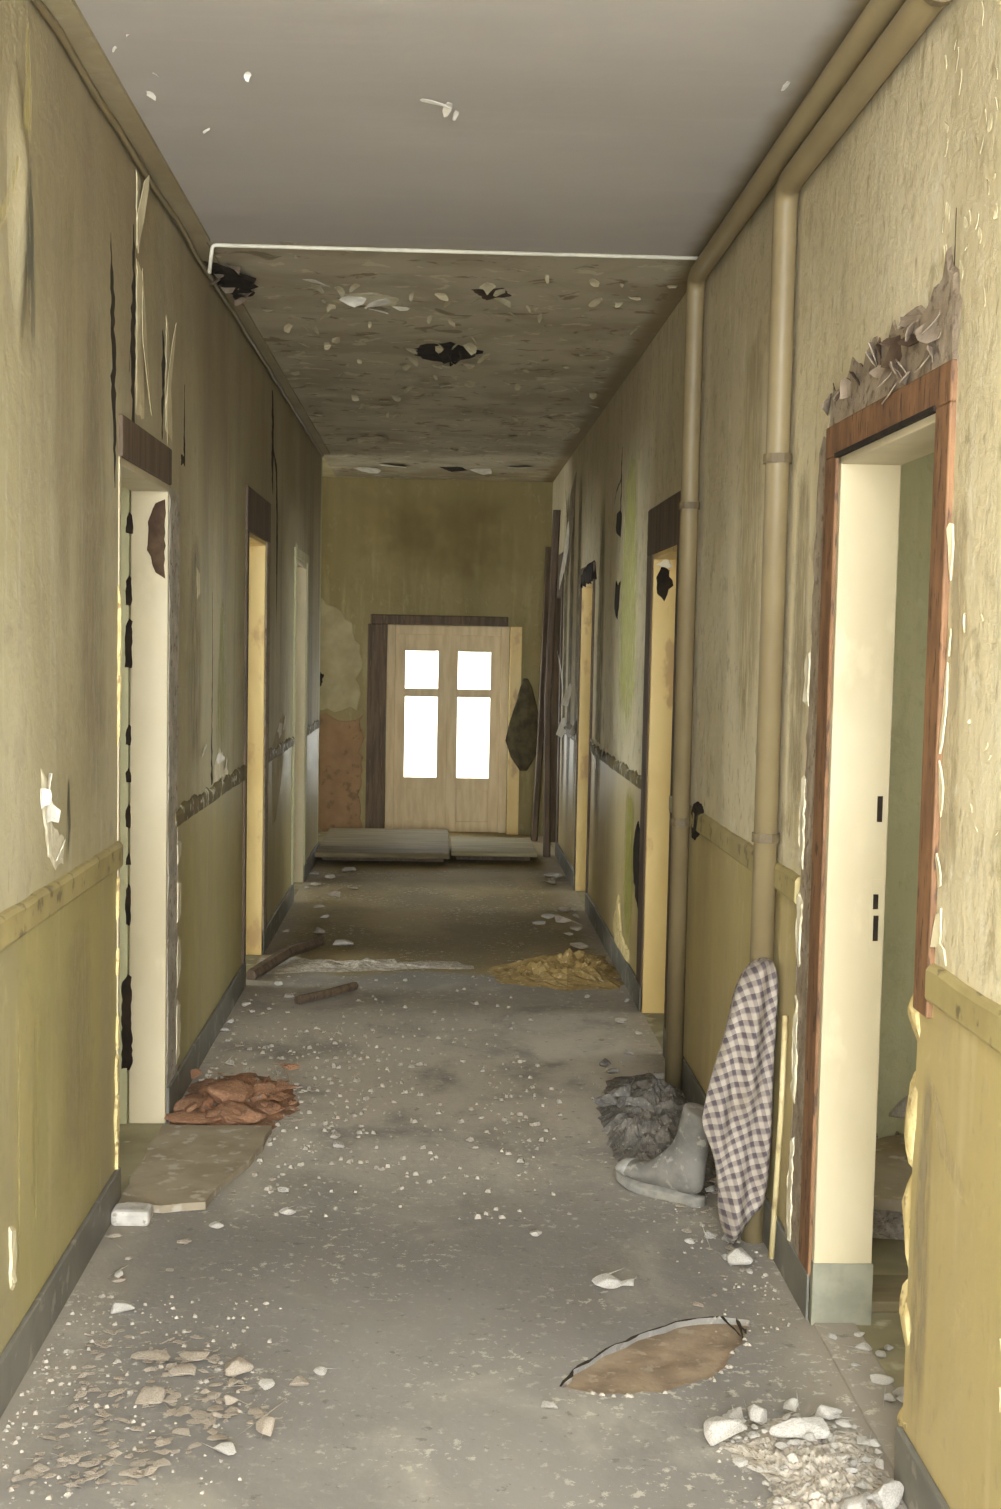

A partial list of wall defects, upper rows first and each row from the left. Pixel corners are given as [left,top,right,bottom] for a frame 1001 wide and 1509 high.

crack [110,224,185,483]
flaking render [203,261,414,350]
flaking render [351,274,558,418]
peeling [40,769,66,870]
flaking render [116,853,131,926]
flaking render [117,575,133,746]
flaking render [126,487,200,1087]
peeling [318,598,364,831]
flaking render [785,172,998,1256]
flaking render [114,948,133,1170]
spalling [560,1293,751,1398]
flaking render [828,1071,918,1430]